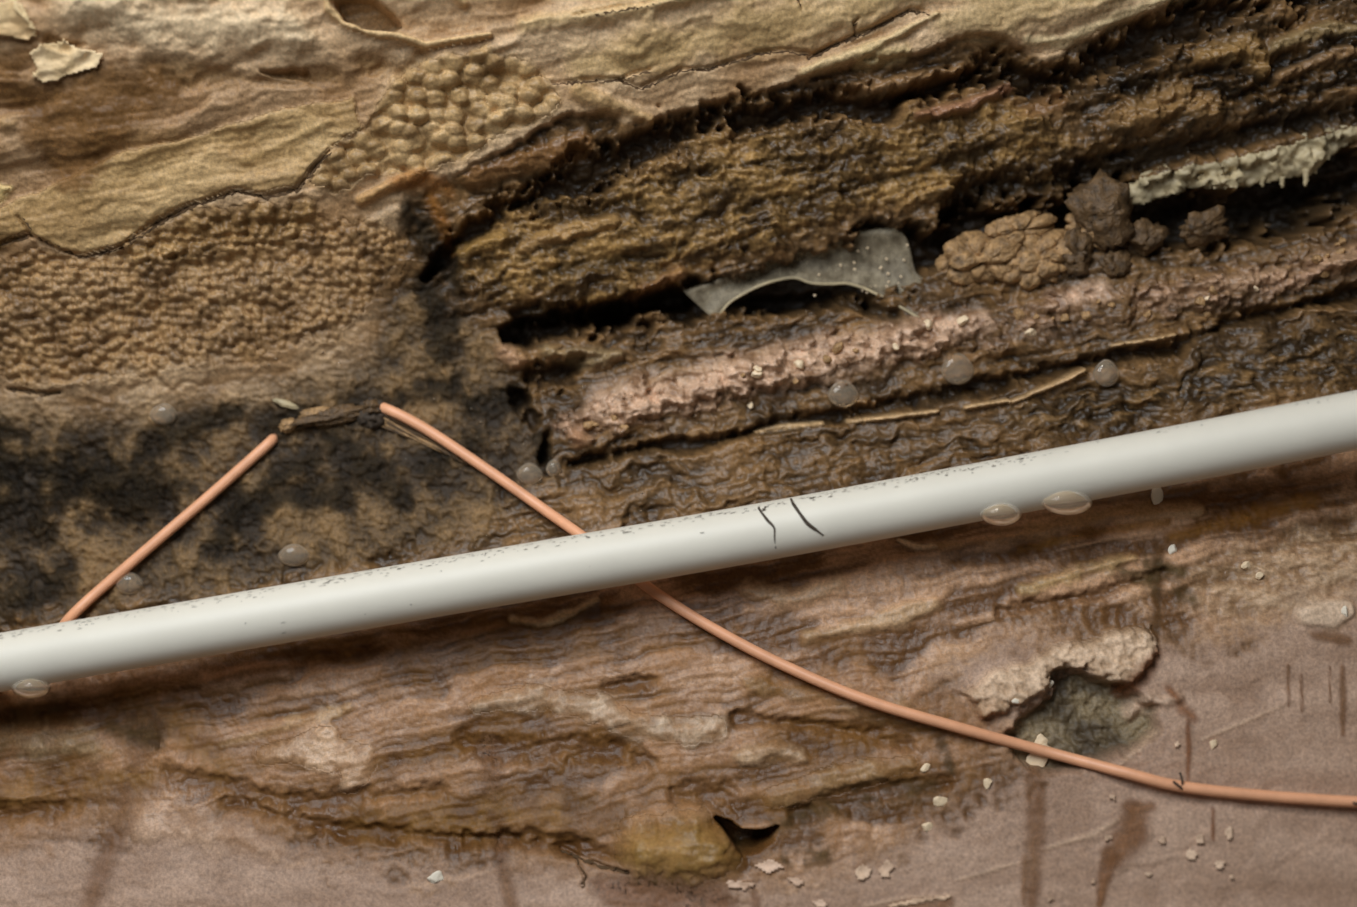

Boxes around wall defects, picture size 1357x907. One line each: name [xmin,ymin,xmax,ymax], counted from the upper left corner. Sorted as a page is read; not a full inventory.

peeling [0,0,103,83]
crack [2,152,332,258]
peeling [0,98,361,254]
spalling [392,0,1357,441]
water stain [341,201,526,475]
water stain [0,404,245,541]
water stain [261,405,320,435]
water stain [205,430,414,557]
water stain [1113,546,1185,695]
spalling [963,627,1158,774]
water stain [590,876,732,907]
water stain [1097,803,1154,907]